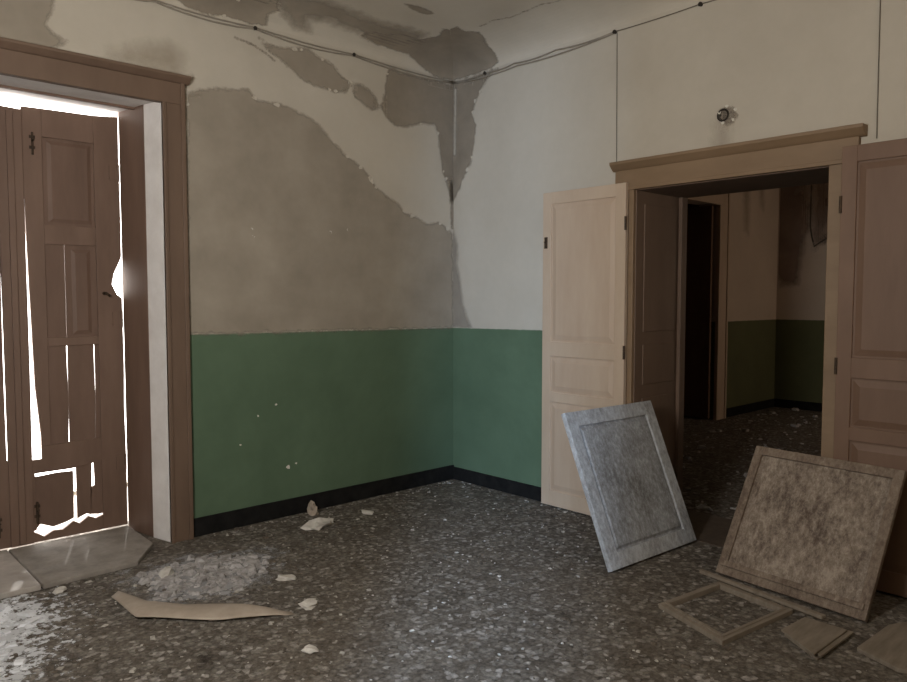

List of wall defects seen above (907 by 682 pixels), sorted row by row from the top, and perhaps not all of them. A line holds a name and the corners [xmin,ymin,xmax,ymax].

peeling [0,0,60,47]
peeling [179,0,278,25]
peeling [265,44,378,109]
peeling [185,88,453,335]